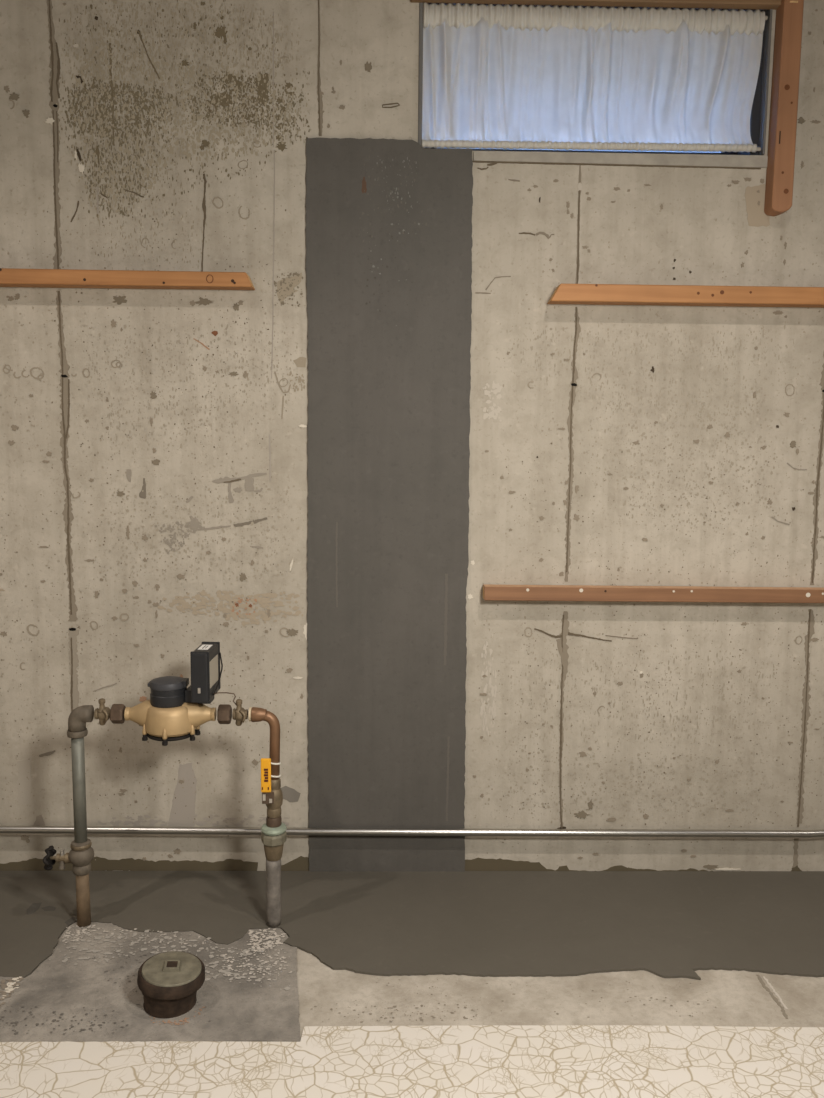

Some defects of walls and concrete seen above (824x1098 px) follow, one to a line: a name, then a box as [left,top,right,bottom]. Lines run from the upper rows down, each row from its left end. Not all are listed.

water stain [45,0,310,269]
crack [49,0,144,712]
crack [473,161,761,572]
crack [812,406,824,583]
crack [797,609,811,827]